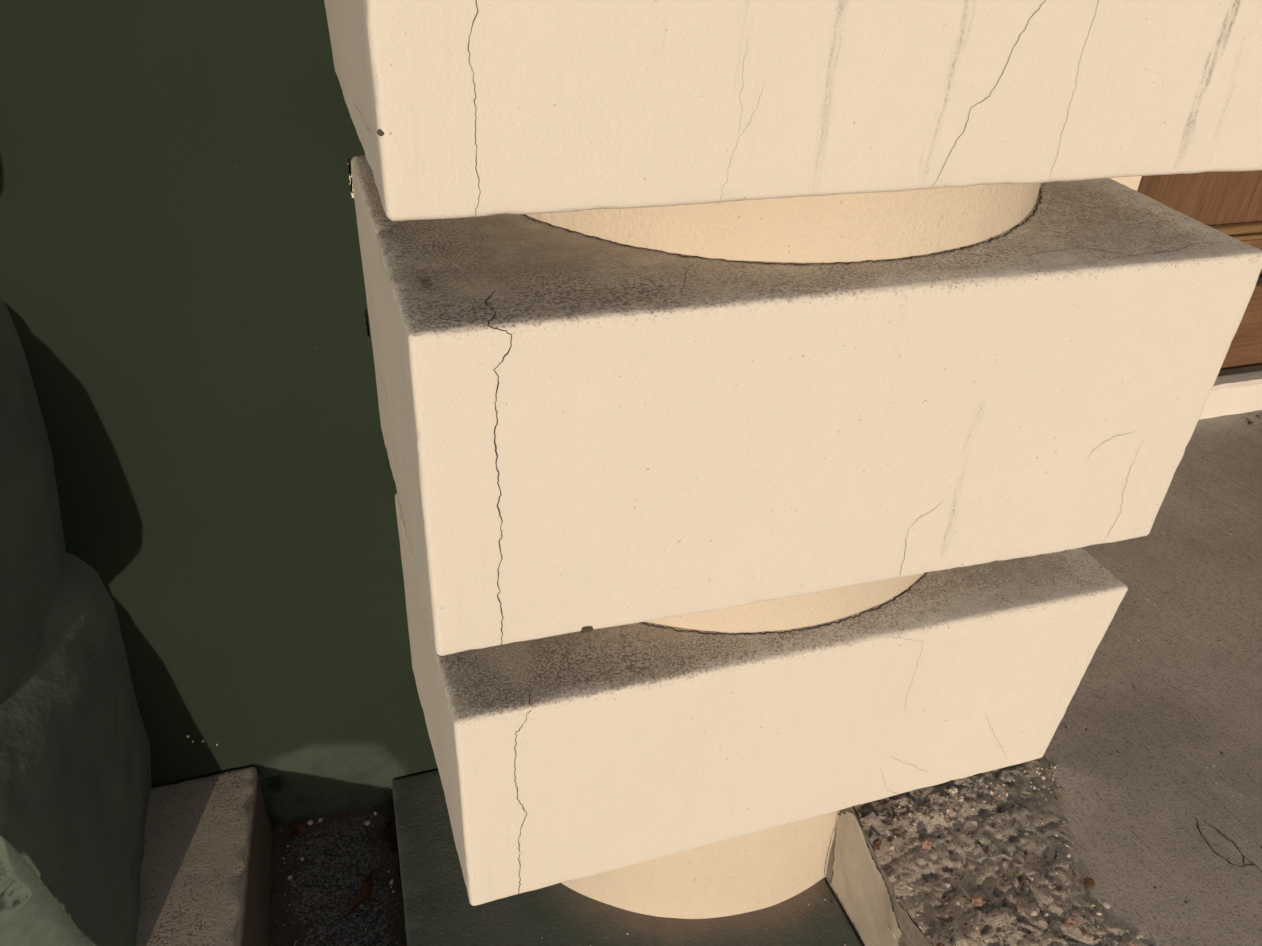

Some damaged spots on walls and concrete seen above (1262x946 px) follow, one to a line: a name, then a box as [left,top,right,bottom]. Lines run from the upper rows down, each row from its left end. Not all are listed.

crack [468,0,481,217]
crack [522,0,1191,298]
crack [485,290,512,645]
crack [514,690,531,895]
spalling [831,755,1153,946]